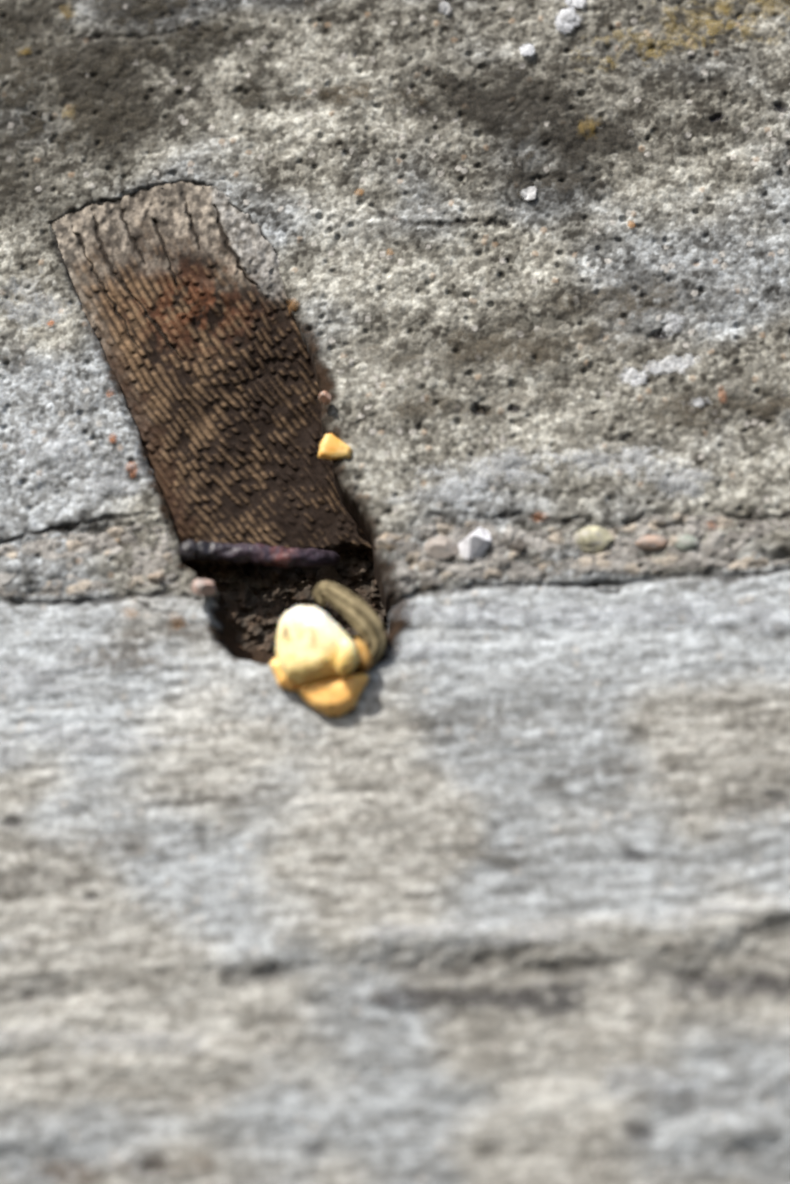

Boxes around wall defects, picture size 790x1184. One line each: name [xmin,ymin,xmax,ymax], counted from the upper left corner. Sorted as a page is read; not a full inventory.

spalling [0,524,178,596]